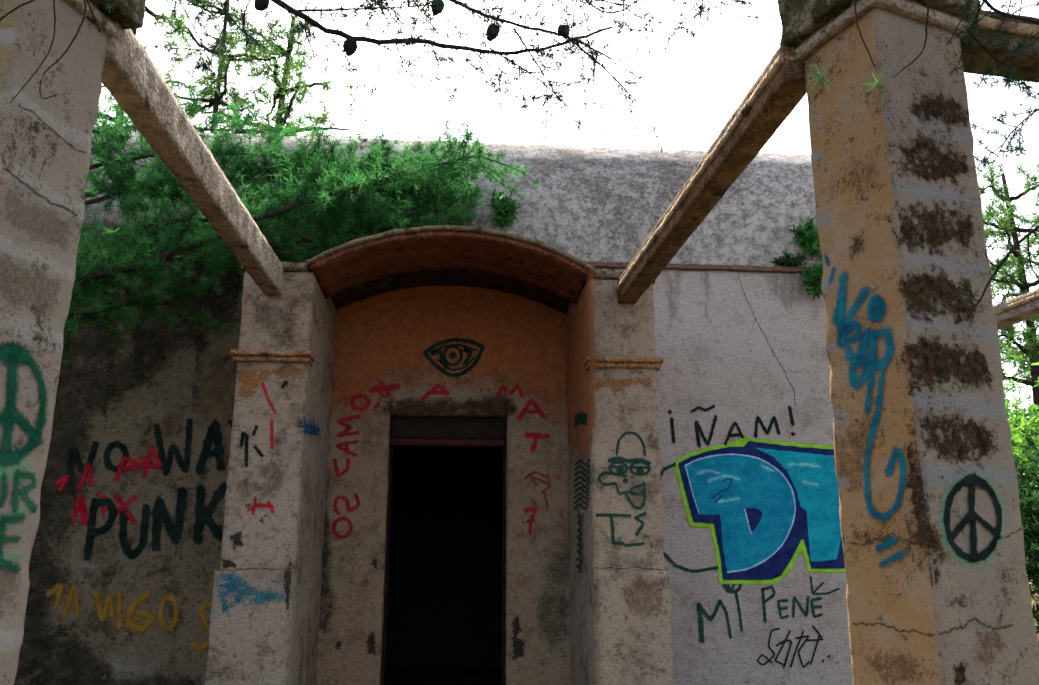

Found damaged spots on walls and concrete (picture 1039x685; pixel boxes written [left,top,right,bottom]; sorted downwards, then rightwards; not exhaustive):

crack [735,264,804,406]
water stain [15,258,241,685]
crack [853,618,1013,640]